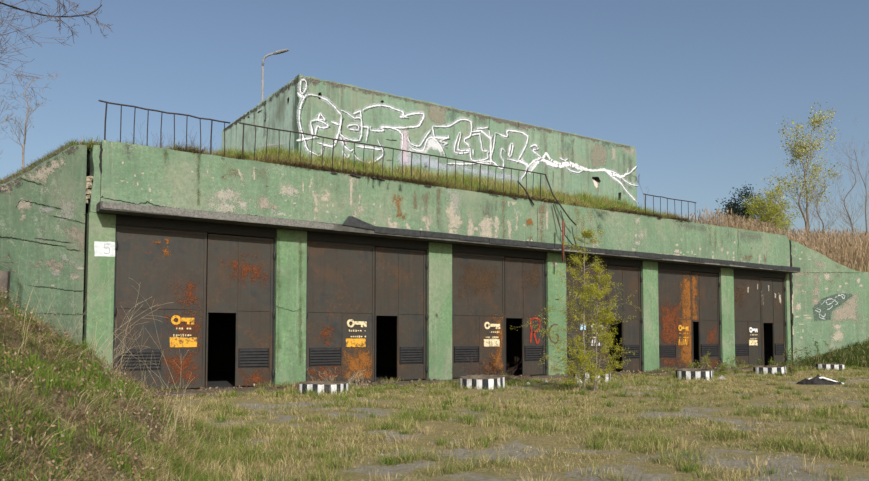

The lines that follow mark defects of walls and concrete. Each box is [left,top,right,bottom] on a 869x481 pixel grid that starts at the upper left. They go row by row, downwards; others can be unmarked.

crack [97,144,105,174]
crack [16,178,89,225]
crack [101,196,172,208]
peeling [444,201,533,241]
crack [0,236,78,251]
rust [162,281,203,386]
rust [308,345,372,381]
rust [485,316,503,373]
rust [659,274,700,367]